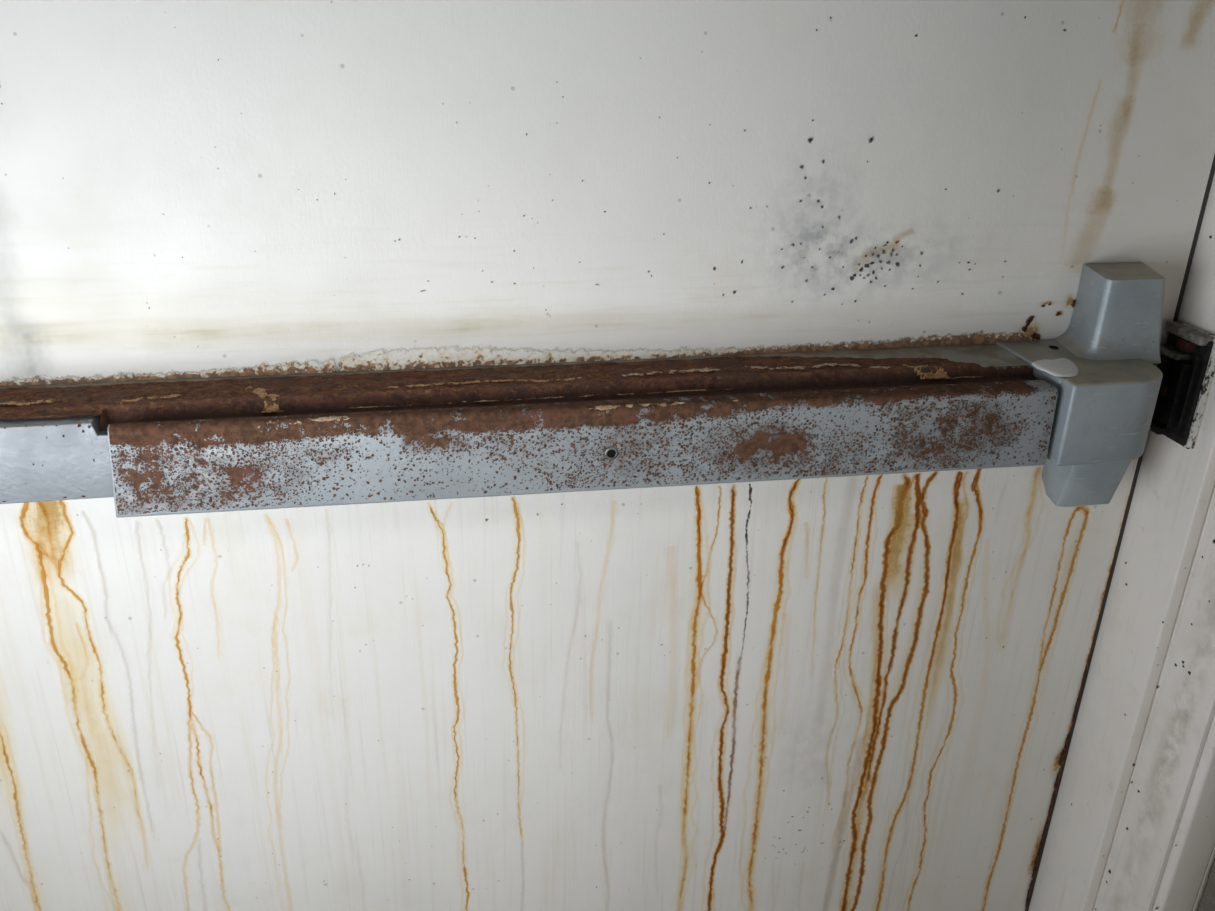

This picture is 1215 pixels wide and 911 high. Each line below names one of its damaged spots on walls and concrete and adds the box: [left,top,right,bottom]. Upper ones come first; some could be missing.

rust [0,356,1057,911]
rust [985,507,1096,910]